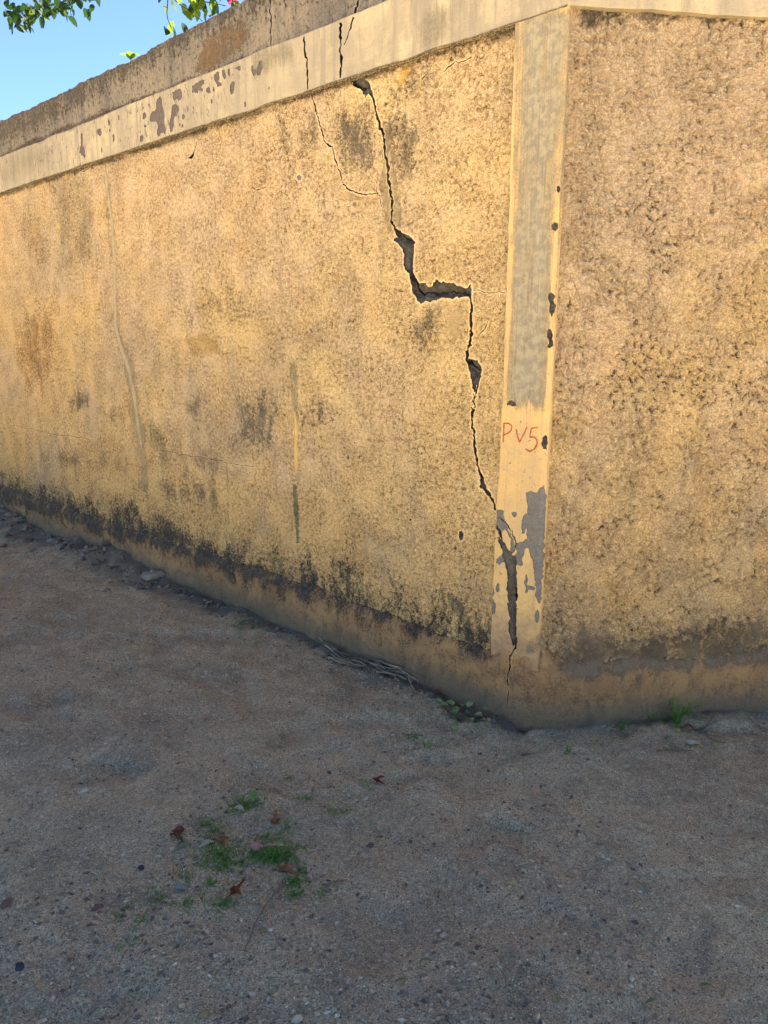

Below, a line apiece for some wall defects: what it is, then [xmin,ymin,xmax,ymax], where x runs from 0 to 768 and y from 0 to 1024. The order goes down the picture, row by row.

peeling [140,60,263,142]
crack [303,0,415,242]
crack [410,275,518,609]
leakage [0,470,492,661]
peeling [492,486,547,647]
crack [506,641,517,708]